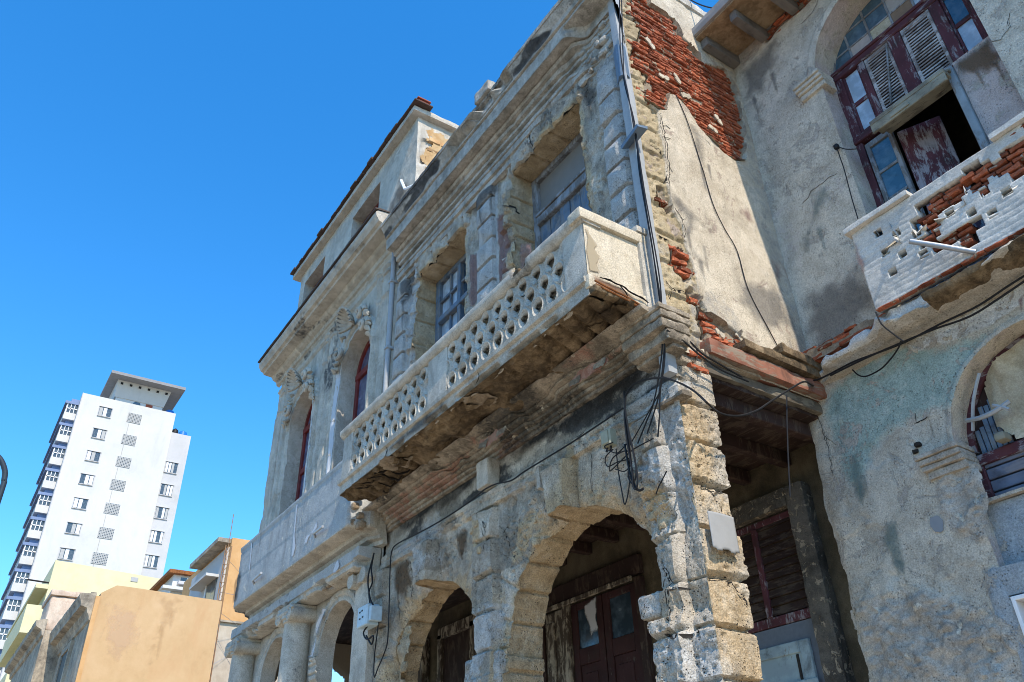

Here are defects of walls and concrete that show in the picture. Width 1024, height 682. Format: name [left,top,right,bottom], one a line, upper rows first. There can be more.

spalling [625,0,747,169]
spalling [420,128,448,169]
spalling [654,185,673,213]
spalling [917,124,1024,253]
spalling [660,244,743,375]
spalling [801,313,887,363]
spalling [460,392,498,411]
peeling [478,426,506,449]
spalling [345,455,413,531]